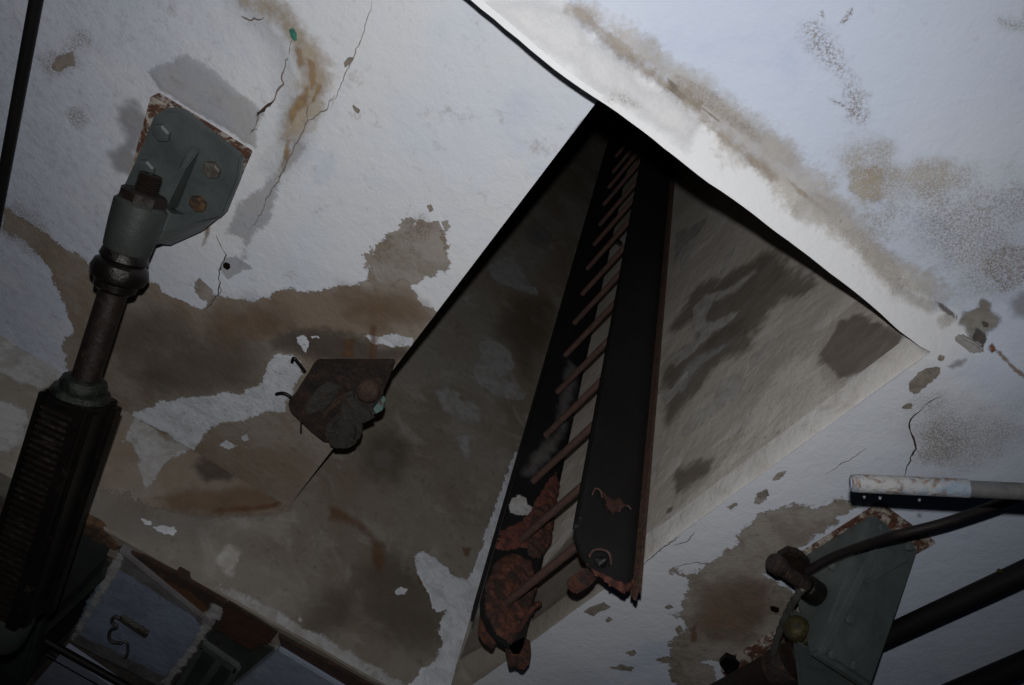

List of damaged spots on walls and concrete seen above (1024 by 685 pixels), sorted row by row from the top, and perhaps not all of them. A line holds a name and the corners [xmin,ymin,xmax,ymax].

crack [249,4,372,230]
damp [606,34,742,125]
flaking render [2,206,98,371]
crack [206,236,227,310]
flaking render [95,204,451,522]
damp [660,246,814,436]
damp [820,315,901,377]
peeling [902,355,945,409]
spalling [955,300,999,353]
crack [904,397,939,476]
damp [674,460,711,493]
peeling [153,525,177,536]